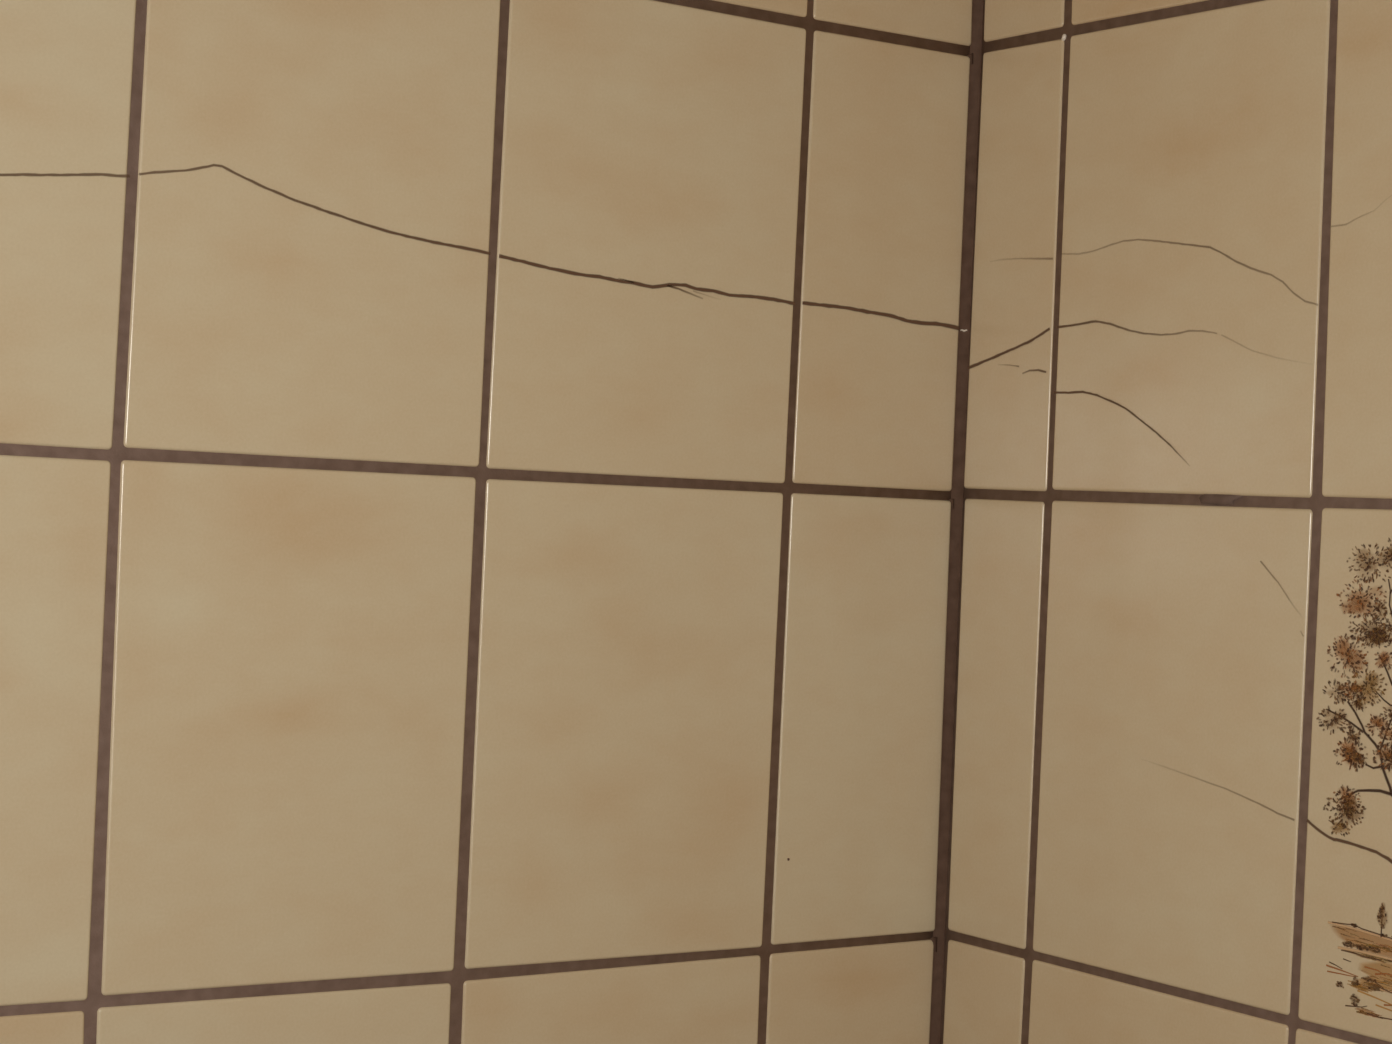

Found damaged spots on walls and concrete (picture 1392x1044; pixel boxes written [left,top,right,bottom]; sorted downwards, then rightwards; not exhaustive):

crack [0,164,959,330]
crack [968,320,1177,453]